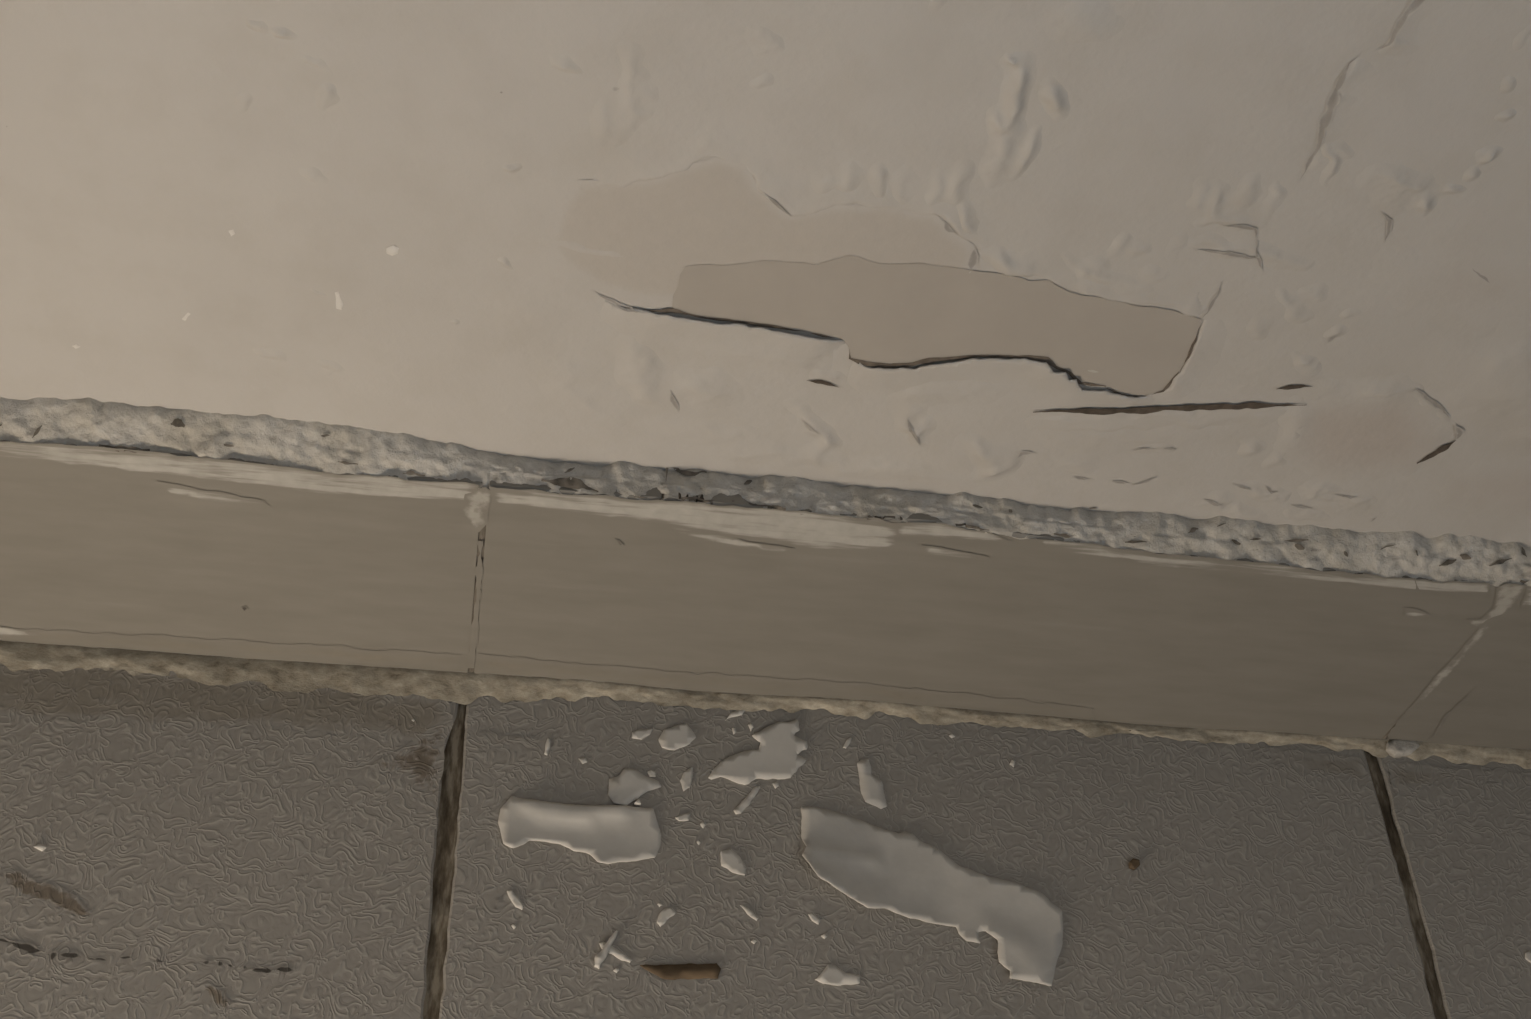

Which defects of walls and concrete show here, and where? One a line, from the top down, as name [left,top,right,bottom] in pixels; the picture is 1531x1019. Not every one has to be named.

crack [669,391,679,412]
peeling [0,119,1531,587]
crack [811,379,837,387]
water stain [1273,394,1452,482]
water stain [0,442,1527,739]